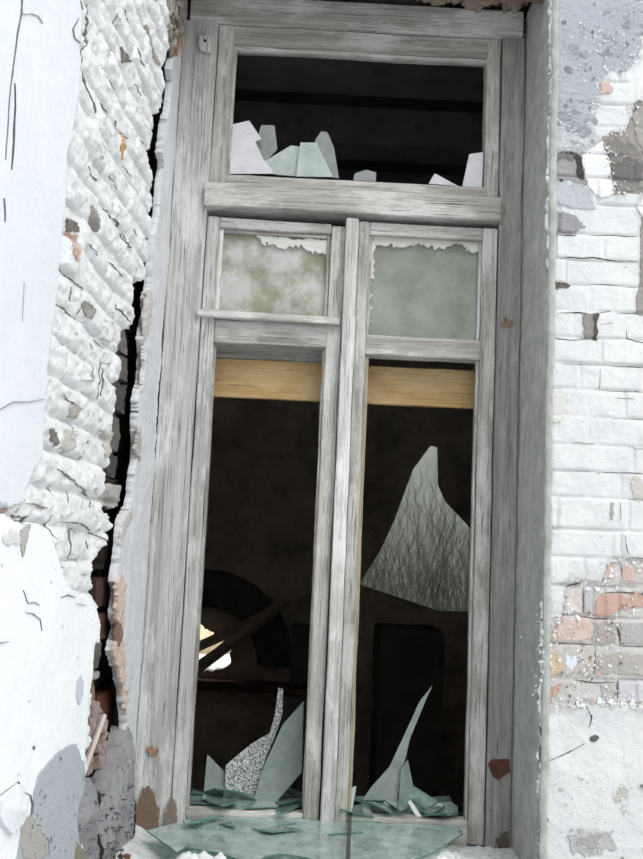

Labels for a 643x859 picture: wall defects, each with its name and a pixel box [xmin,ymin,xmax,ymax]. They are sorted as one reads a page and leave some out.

crack [5,0,43,170]
crack [72,0,95,103]
peeling [548,0,643,210]
crack [566,311,643,343]
crack [155,299,166,459]
crack [561,363,643,420]
flaking render [542,560,643,708]
spalling [78,757,137,859]
crack [130,798,138,837]